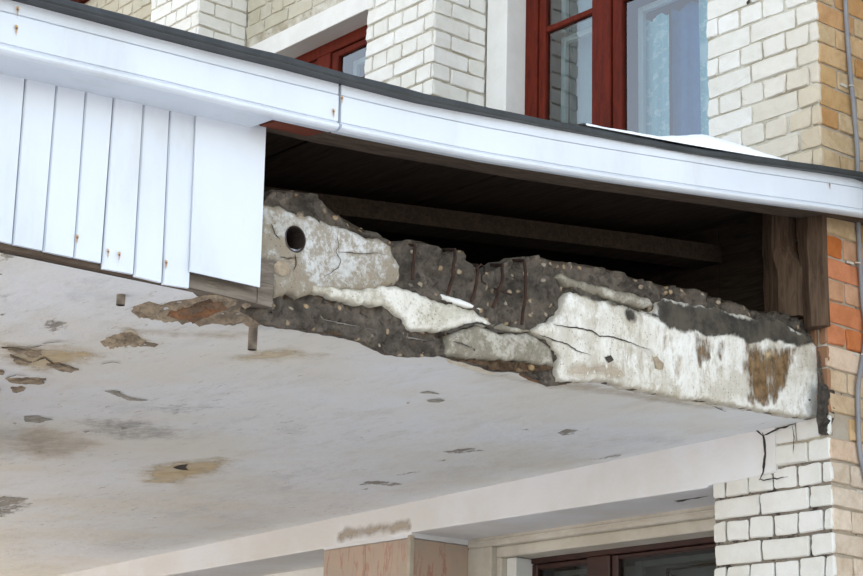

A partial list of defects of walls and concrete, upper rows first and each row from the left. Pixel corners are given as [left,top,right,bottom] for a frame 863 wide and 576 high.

crack [324,237,386,277]
spalling [131,190,812,387]
peeling [0,369,46,393]
peeling [2,347,79,373]
spalling [100,332,158,349]
corrosion [744,343,796,406]
spalling [792,347,835,436]
water stain [148,462,220,482]
crack [756,423,796,481]
water stain [339,522,409,539]